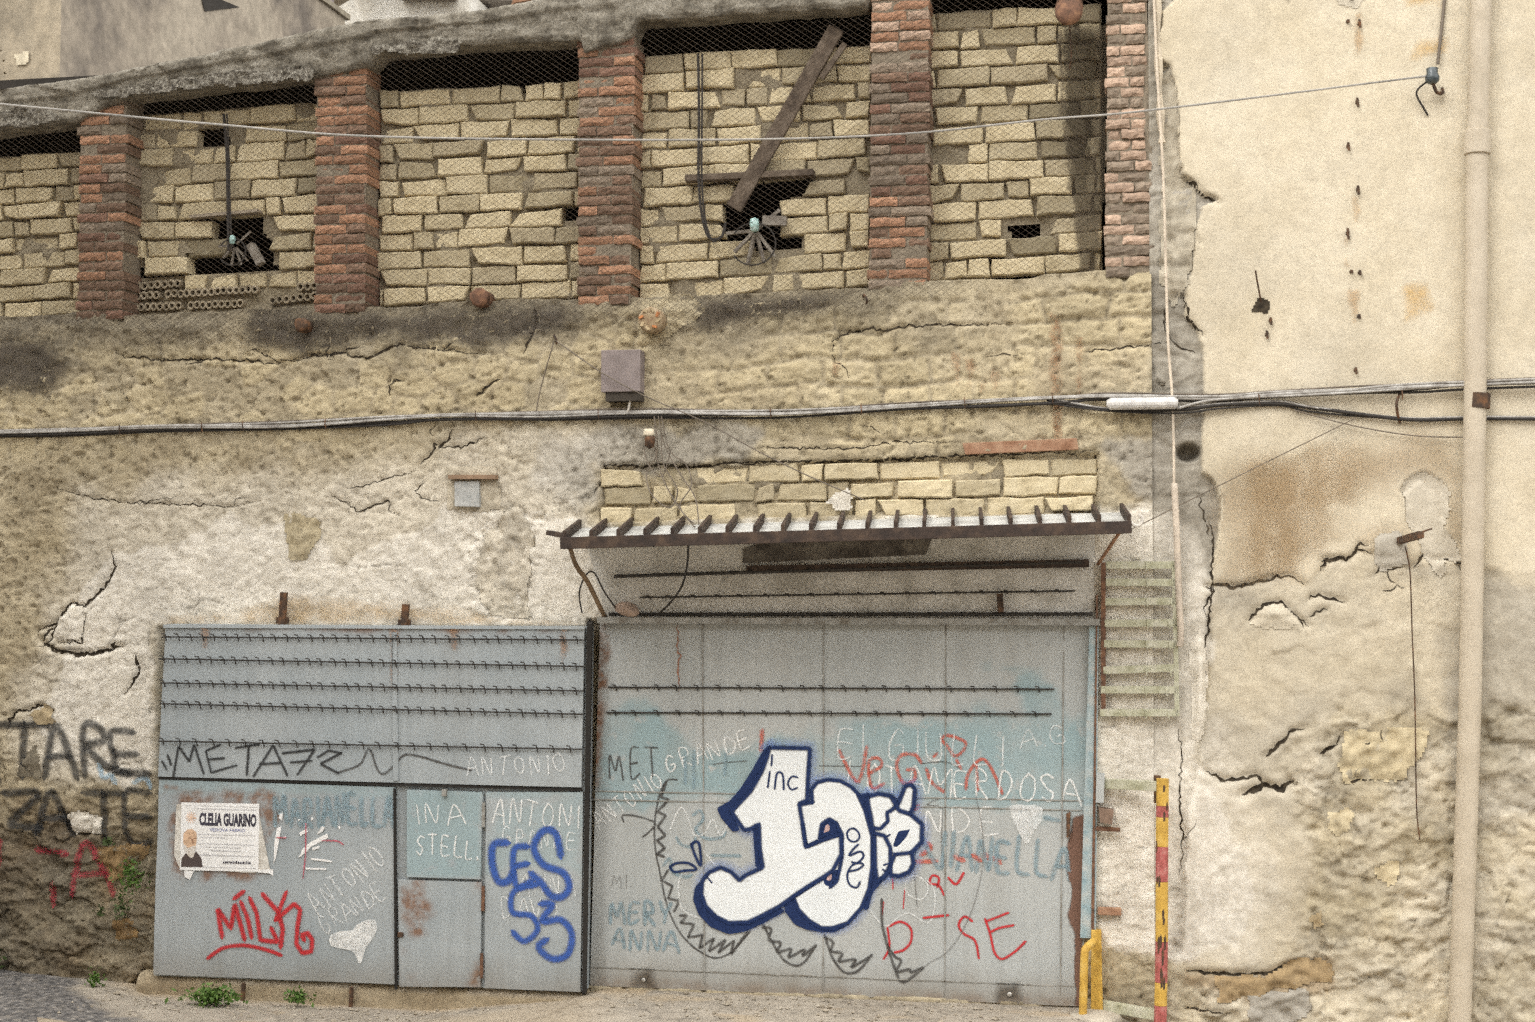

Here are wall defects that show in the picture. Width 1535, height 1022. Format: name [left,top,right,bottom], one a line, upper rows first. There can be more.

spalling [1158,61,1197,306]
spalling [283,511,321,560]
flaking render [1374,472,1461,577]
crack [38,551,140,694]
spalling [1337,727,1429,784]
spalling [1327,807,1355,836]